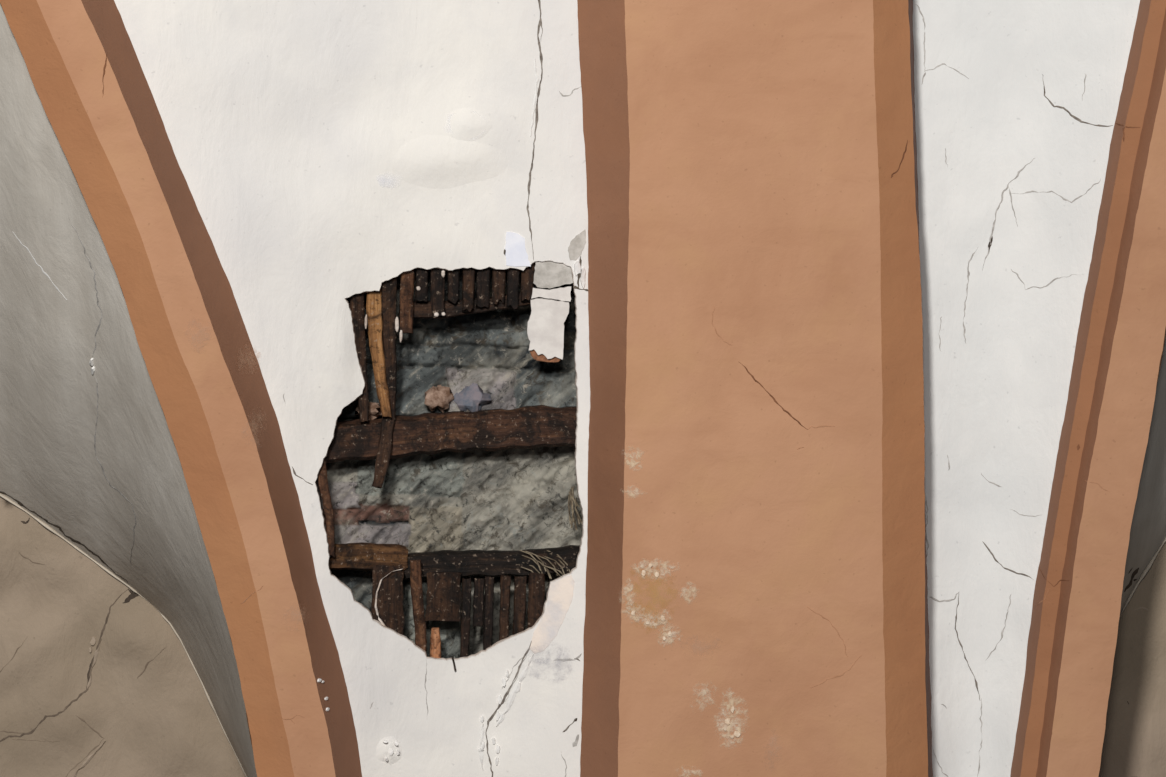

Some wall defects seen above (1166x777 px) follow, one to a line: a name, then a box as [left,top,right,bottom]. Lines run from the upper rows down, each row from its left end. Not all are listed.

crack [527,0,580,260]
crack [917,5,969,84]
crack [1042,74,1140,142]
crack [939,158,1101,351]
crack [0,215,136,777]
peeling [315,230,586,661]
crack [712,307,835,450]
crack [478,641,581,777]
leakage [622,561,680,643]
leakage [697,689,747,746]
crack [930,542,1069,777]